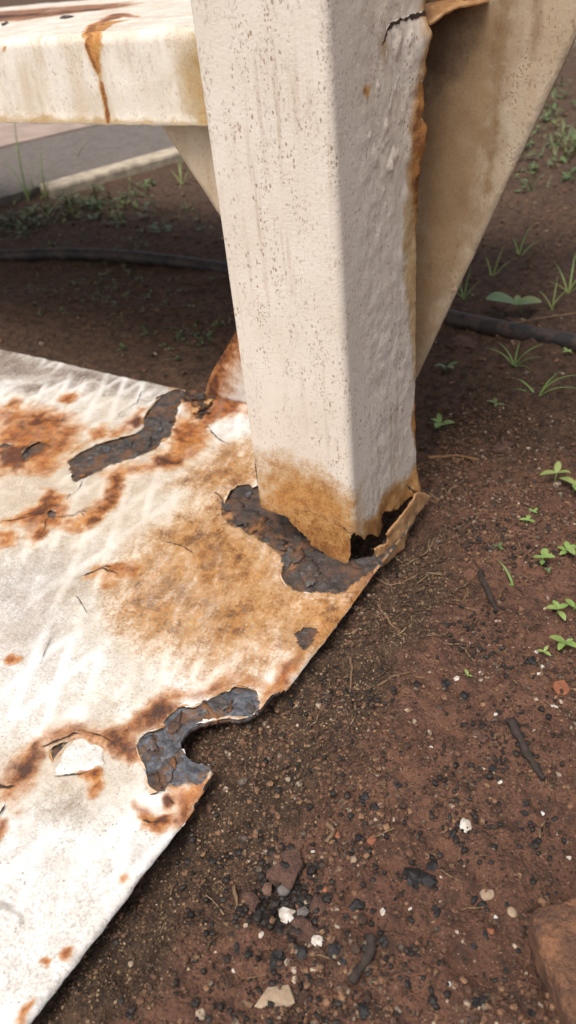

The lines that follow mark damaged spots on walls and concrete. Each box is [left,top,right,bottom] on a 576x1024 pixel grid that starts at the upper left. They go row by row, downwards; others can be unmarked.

rust [0,2,153,124]
crack [381,10,426,45]
rust [403,0,432,378]
rust [0,332,432,800]
spalling [221,484,426,595]